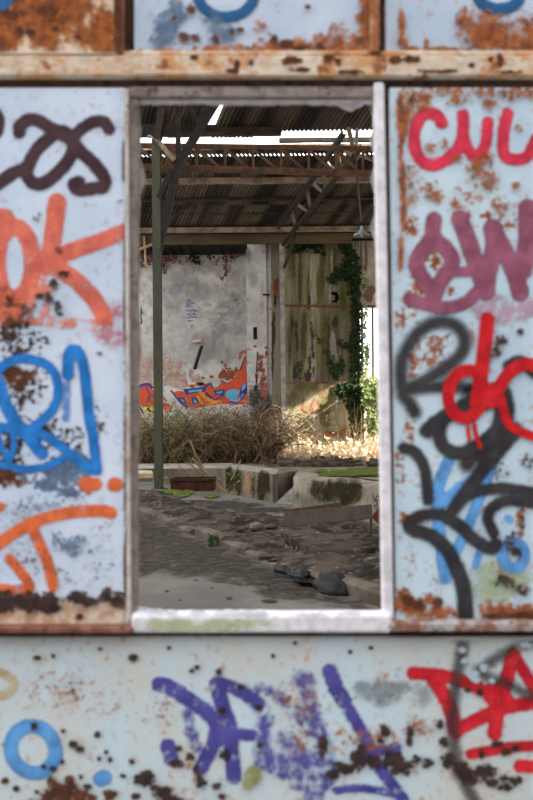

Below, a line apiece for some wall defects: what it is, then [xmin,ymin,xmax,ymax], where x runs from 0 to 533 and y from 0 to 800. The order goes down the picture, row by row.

corrosion [0,0,369,76]
corrosion [388,4,533,74]
corrosion [395,87,533,271]
leakage [288,244,338,382]
flaking render [139,352,153,385]
flaking render [163,353,239,388]
corrosion [0,396,127,624]
leakage [309,477,362,506]
corrosion [396,587,458,619]
corrosion [276,680,523,791]
corrosion [30,759,118,800]
corrosion [119,759,184,800]